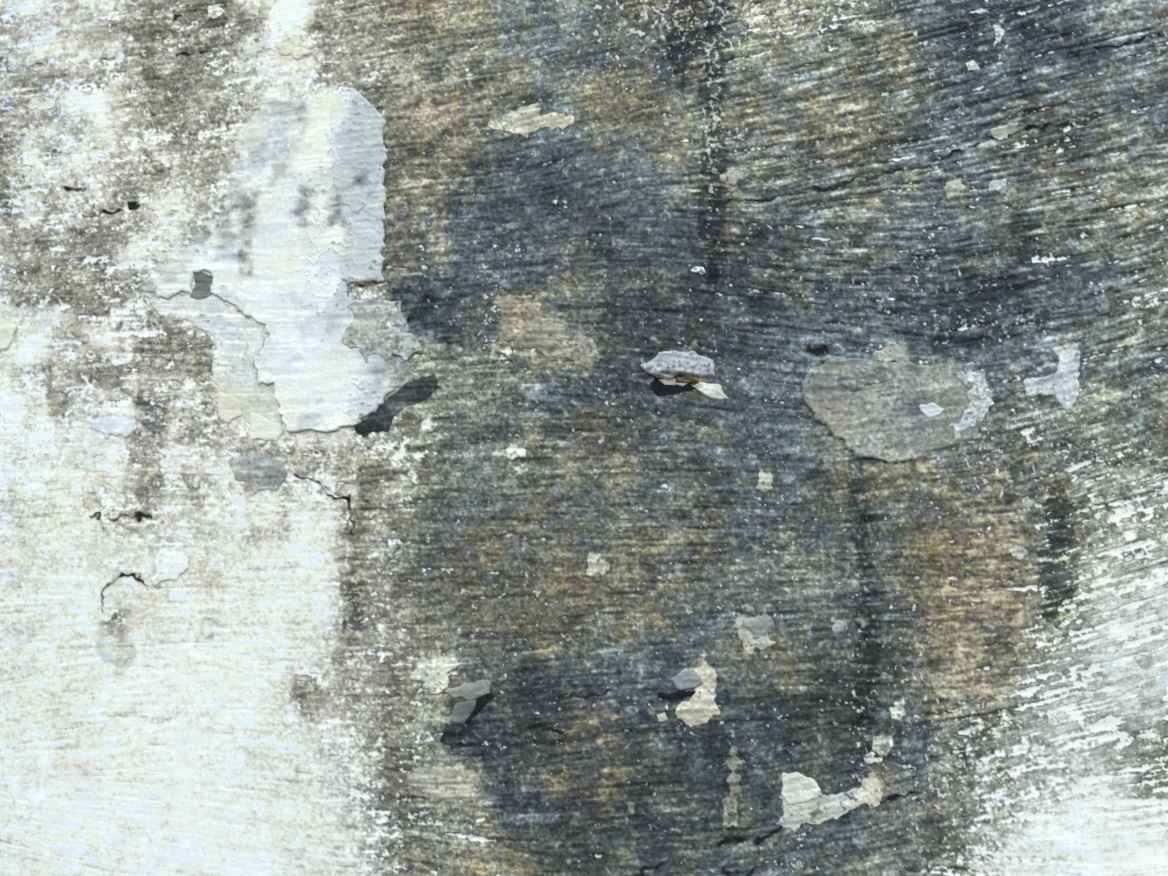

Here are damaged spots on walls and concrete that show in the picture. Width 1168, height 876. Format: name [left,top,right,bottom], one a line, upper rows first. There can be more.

peeling [140,87,439,495]
spalling [640,350,729,400]
leakage [312,0,1168,876]
peeling [801,342,995,463]
crack [101,572,147,612]
leakage [293,675,322,714]
spalling [408,651,494,803]
spalling [657,650,721,727]
peeling [889,697,906,722]
spalling [776,735,894,833]